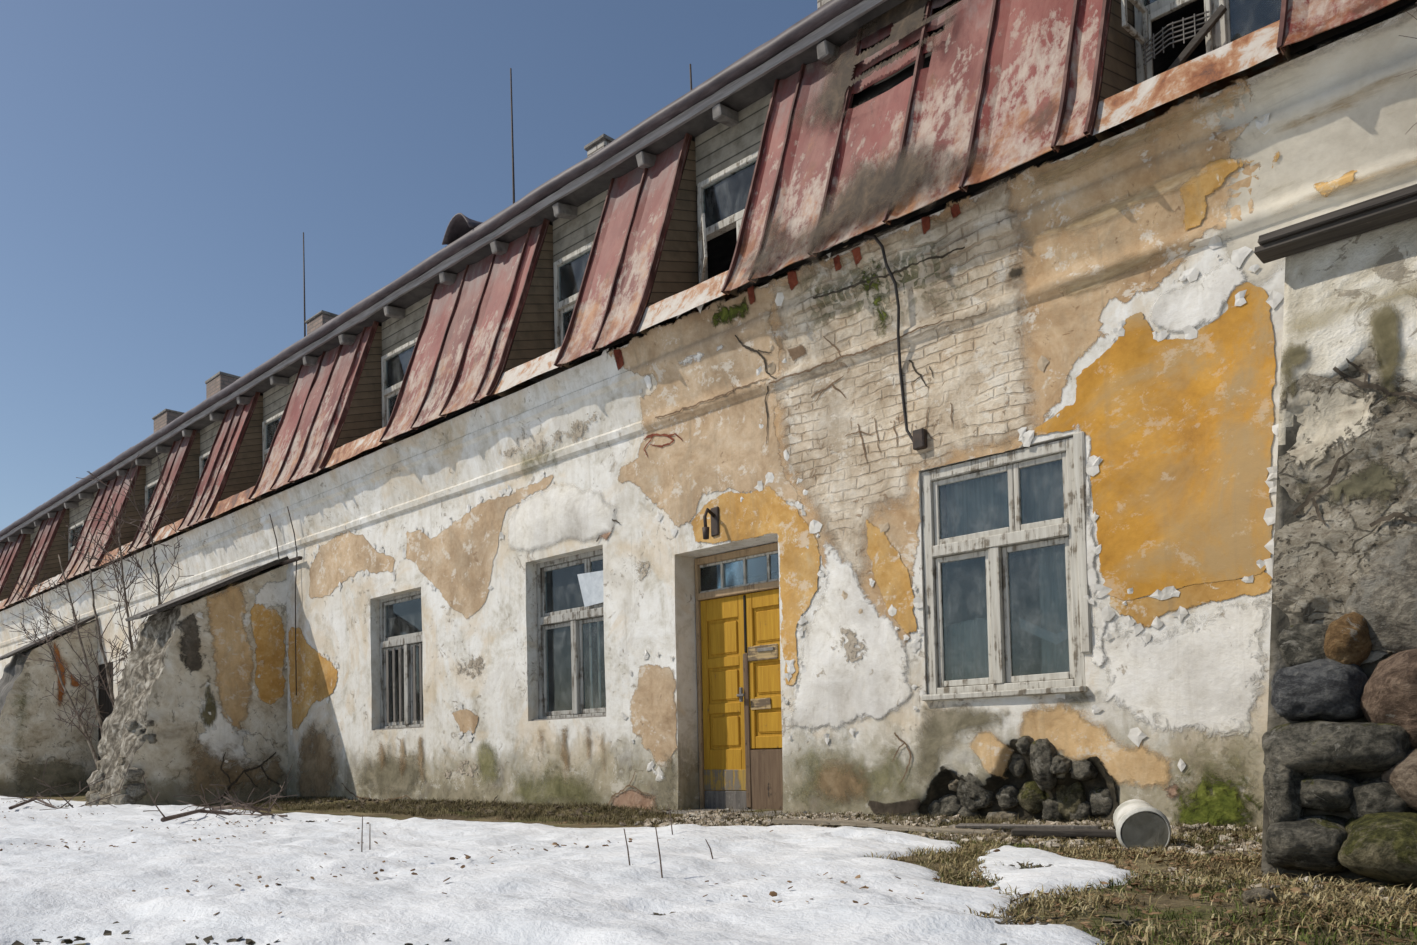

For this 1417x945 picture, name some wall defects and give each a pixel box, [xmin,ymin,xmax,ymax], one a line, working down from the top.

crack [643,319,953,465]
corrosion [742,143,973,304]
crack [813,246,965,299]
flaking render [601,11,1417,653]
leakage [1280,320,1311,398]
crack [1333,358,1417,409]
leakage [1370,290,1417,402]
flaking render [309,471,554,619]
crack [1293,448,1354,526]
peeling [831,627,867,668]
flaking render [612,650,678,810]
flaking render [868,693,1186,823]